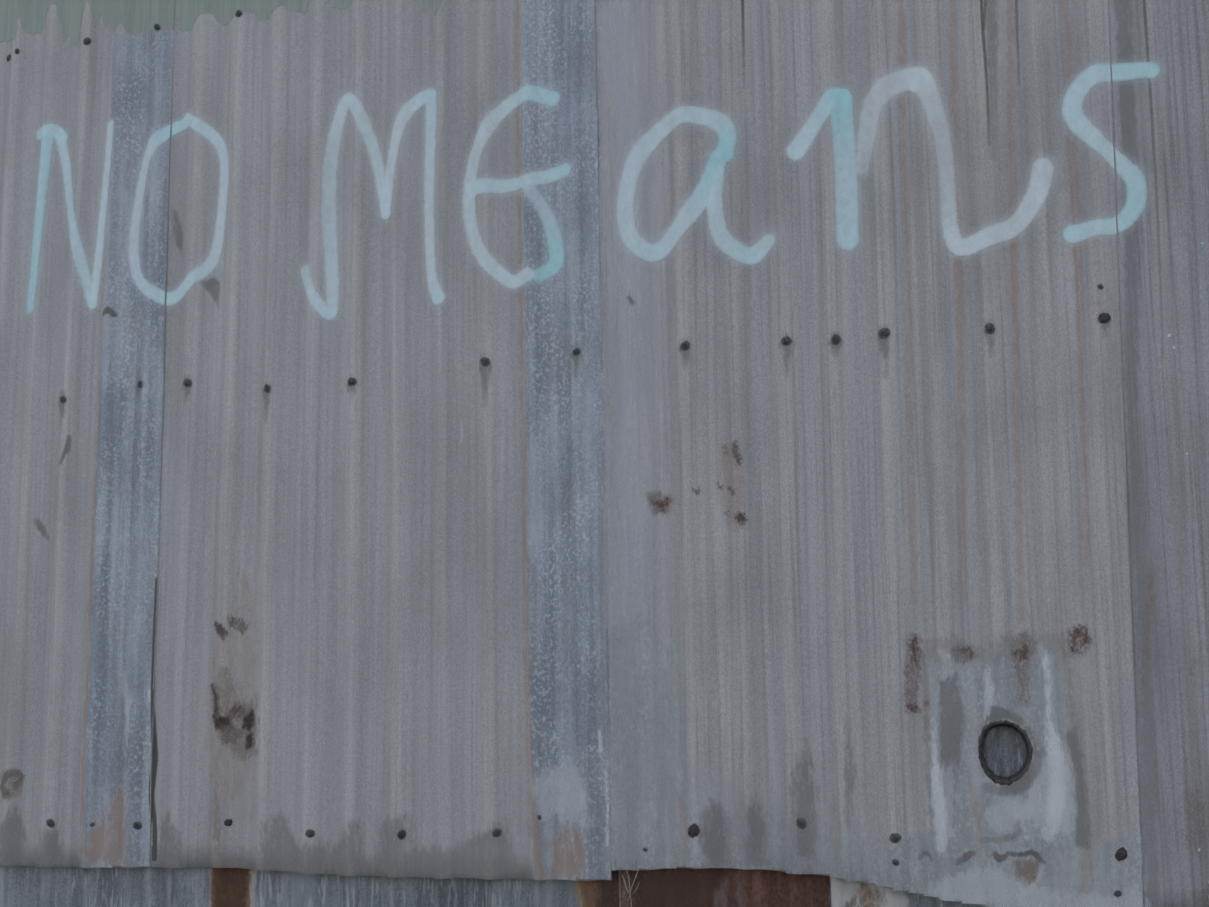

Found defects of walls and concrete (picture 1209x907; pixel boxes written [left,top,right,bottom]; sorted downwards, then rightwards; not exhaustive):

corrosion [648,491,671,515]
corrosion [214,617,248,640]
corrosion [906,635,932,713]
corrosion [1011,641,1030,662]
corrosion [1068,626,1091,652]
corrosion [210,669,256,758]
corrosion [209,804,257,907]
corrosion [533,826,723,907]